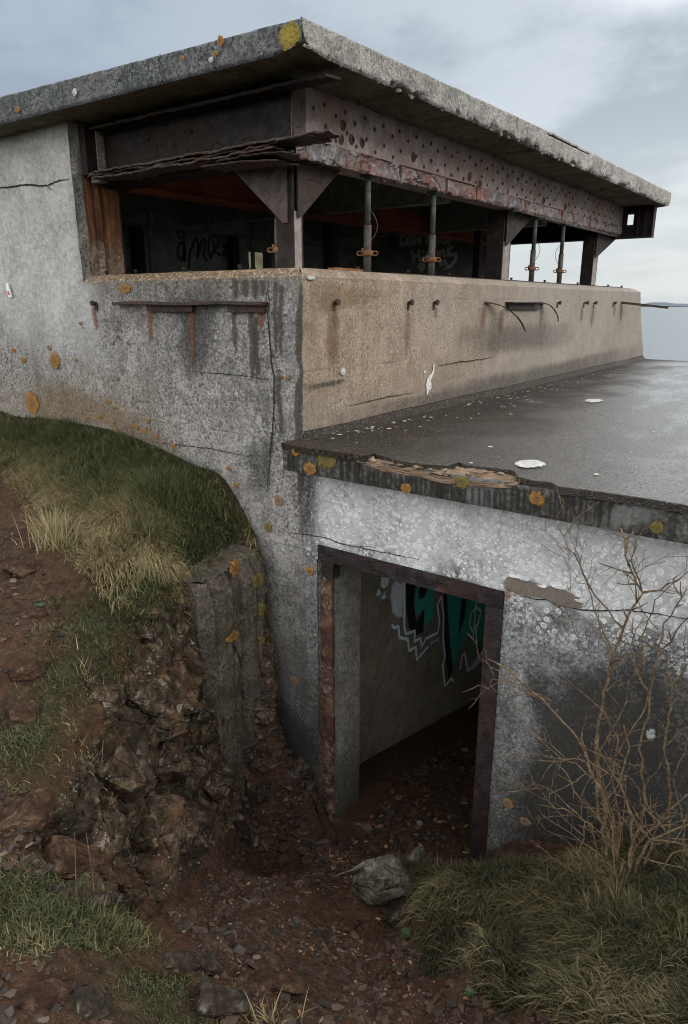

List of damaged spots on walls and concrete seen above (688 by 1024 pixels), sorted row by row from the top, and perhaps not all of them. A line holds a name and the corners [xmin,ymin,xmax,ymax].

crack [0,179,67,191]
leakage [231,279,283,377]
crack [154,279,283,493]
spalling [356,456,518,488]
leakage [339,459,611,527]
crack [287,532,419,560]
peeling [504,572,588,608]
leakage [514,648,688,846]